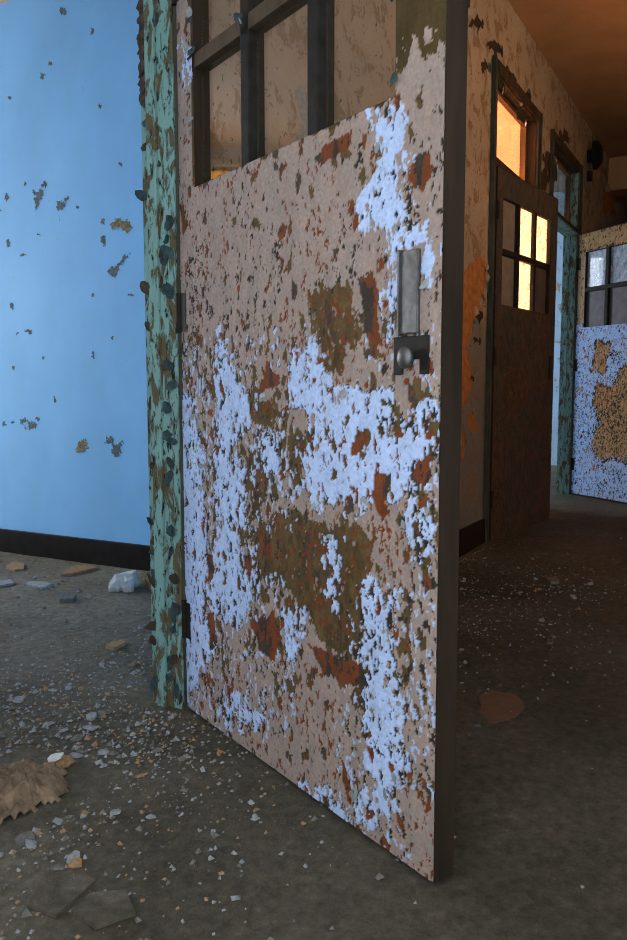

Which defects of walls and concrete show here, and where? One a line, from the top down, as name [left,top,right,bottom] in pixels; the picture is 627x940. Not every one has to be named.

peeling [24,181,47,211]
peeling [100,218,133,247]
spalling [107,252,131,278]
peeling [571,223,627,503]
peeling [2,417,40,430]
peeling [76,438,89,453]
peeling [104,436,124,457]
peeling [127,0,447,882]
peeling [47,752,64,763]